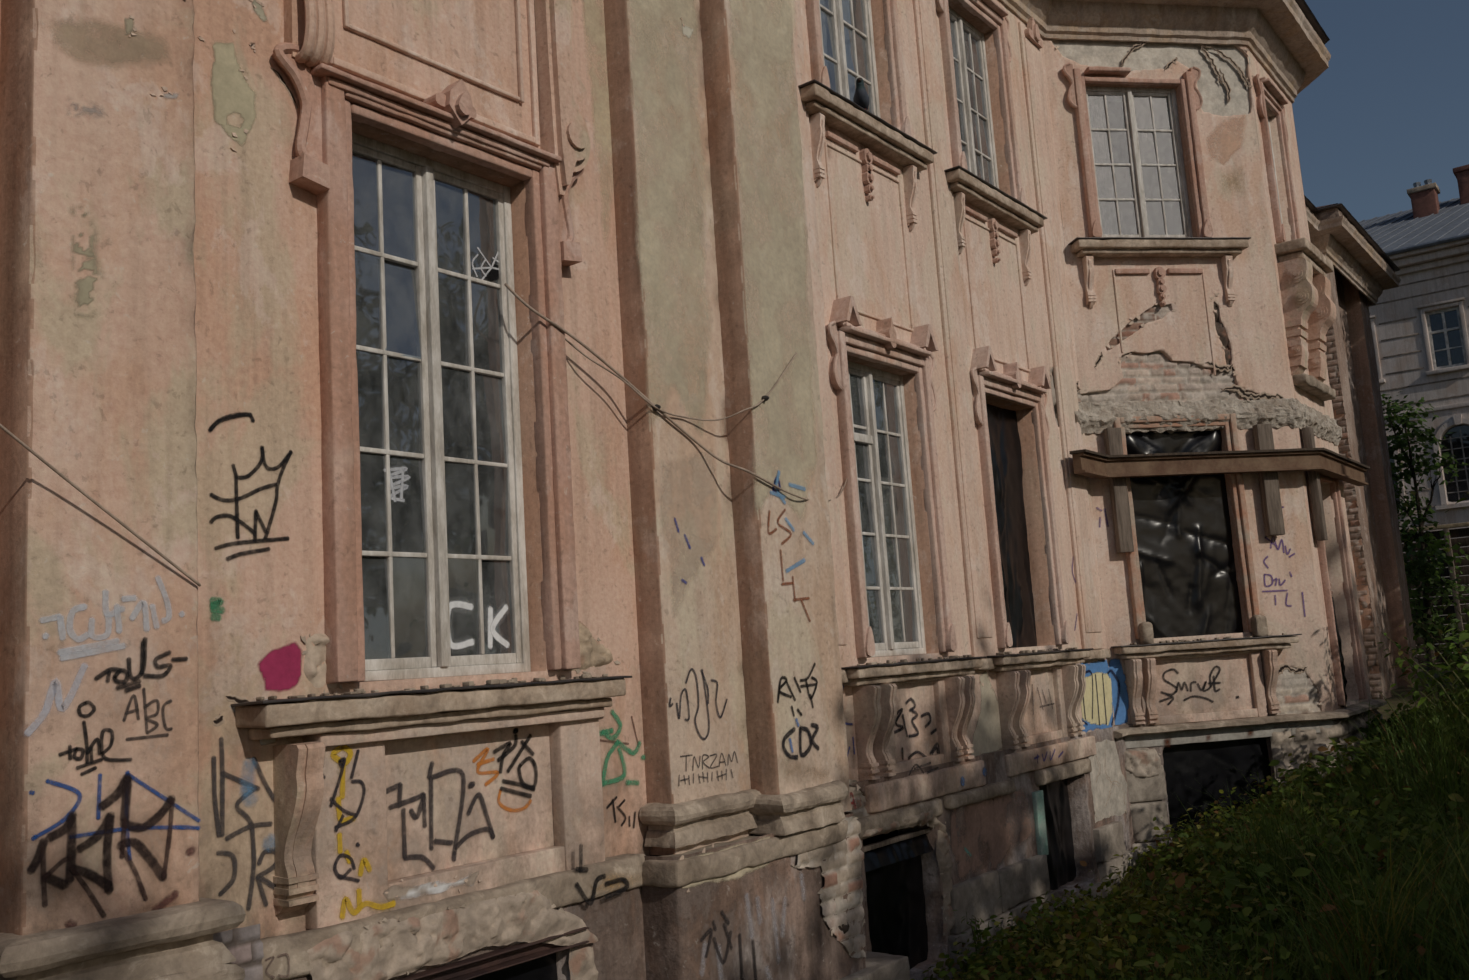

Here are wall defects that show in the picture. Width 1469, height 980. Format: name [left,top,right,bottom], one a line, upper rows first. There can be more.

peeling [198,29,256,152]
spalling [1051,39,1254,116]
spalling [1050,367,1059,427]
spalling [1077,302,1273,404]
peeling [682,862,769,893]
spalling [791,779,955,958]